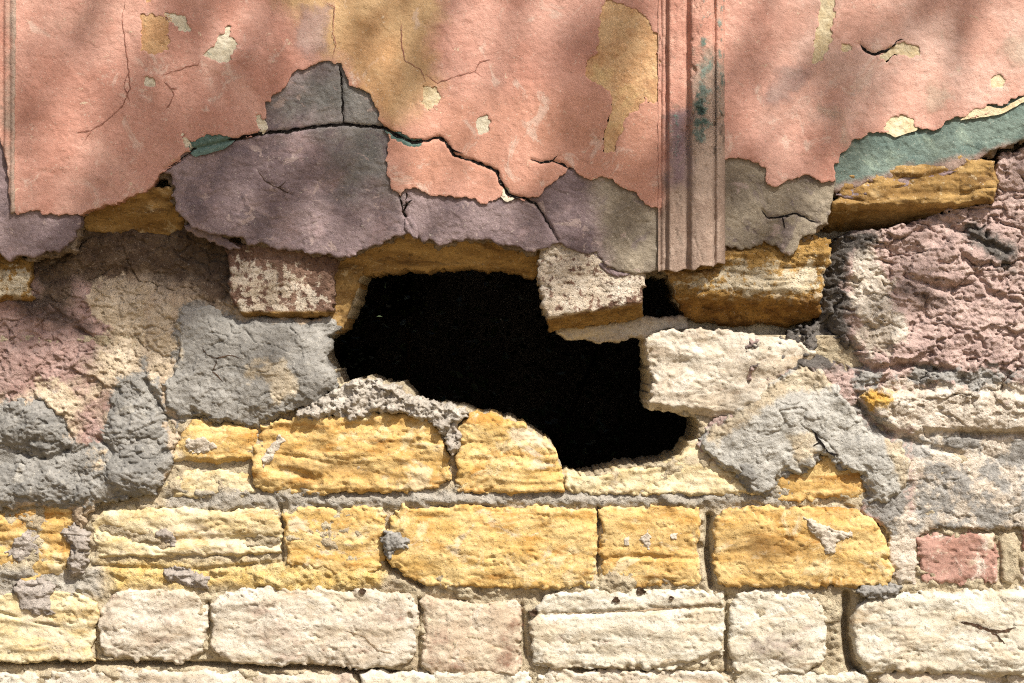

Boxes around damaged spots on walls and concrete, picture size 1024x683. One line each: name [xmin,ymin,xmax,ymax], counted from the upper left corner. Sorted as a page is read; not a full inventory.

crack [229,2,558,240]
crack [530,156,571,169]
peeling [766,0,852,103]
crack [861,39,902,56]
peeling [991,74,1006,88]
spalling [0,0,721,529]